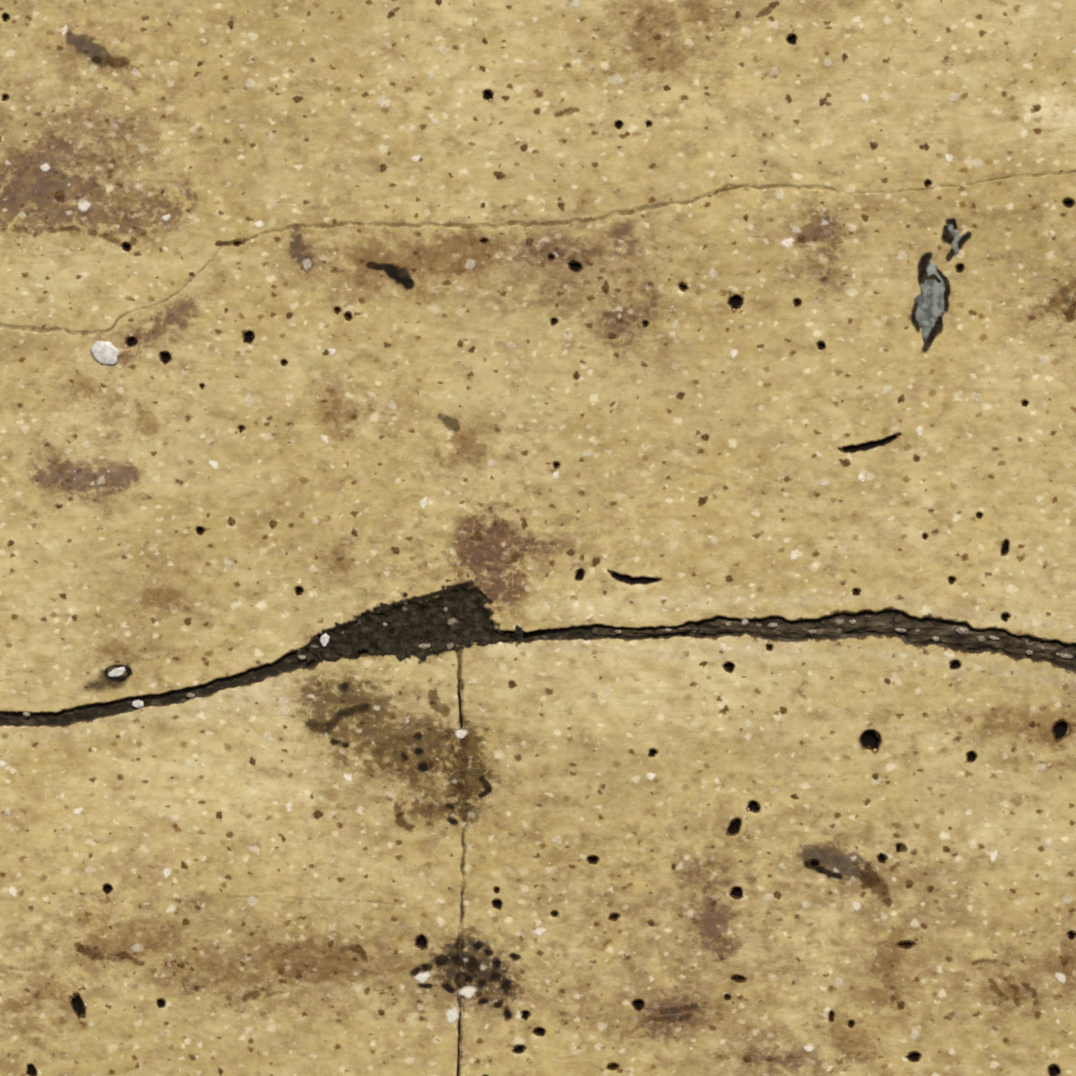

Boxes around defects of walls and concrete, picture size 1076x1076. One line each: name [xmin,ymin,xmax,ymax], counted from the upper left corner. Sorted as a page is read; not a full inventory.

crack [222,235,257,246]
crack [320,221,347,229]
crack [388,222,471,230]
crack [508,185,811,227]
crack [0,632,378,754]
crack [456,584,1076,949]
crack [456,977,465,1076]